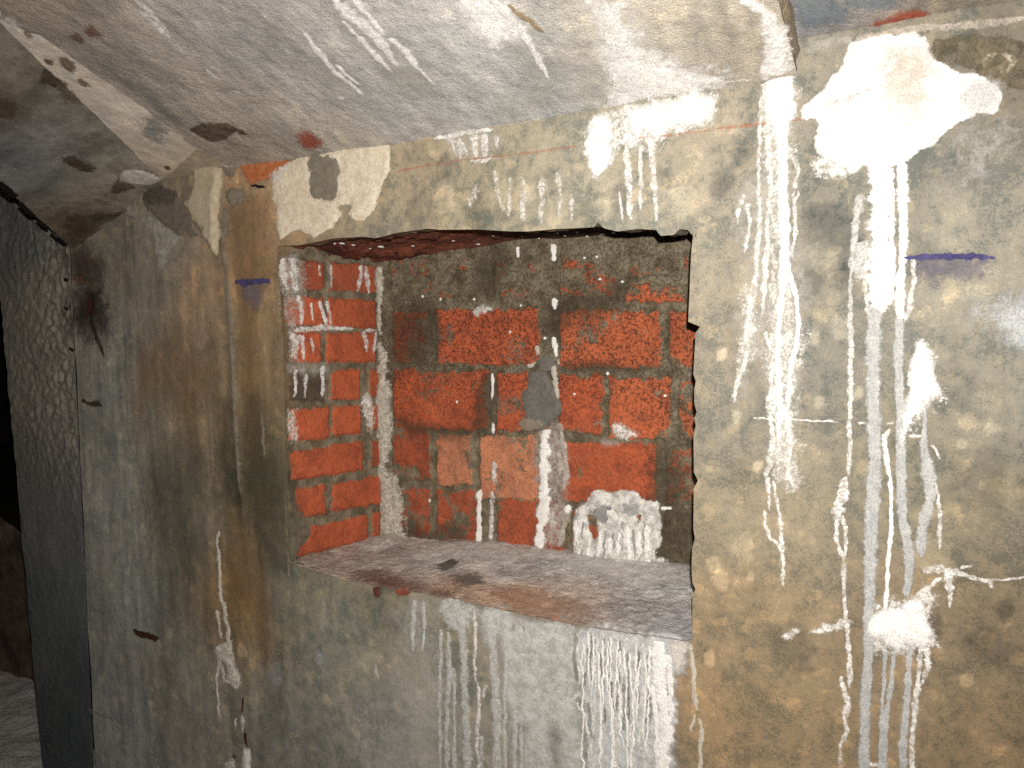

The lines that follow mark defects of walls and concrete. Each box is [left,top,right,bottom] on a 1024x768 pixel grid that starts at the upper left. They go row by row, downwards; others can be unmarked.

water stain [212,531,252,768]
water stain [279,255,705,768]
water stain [519,0,1024,768]